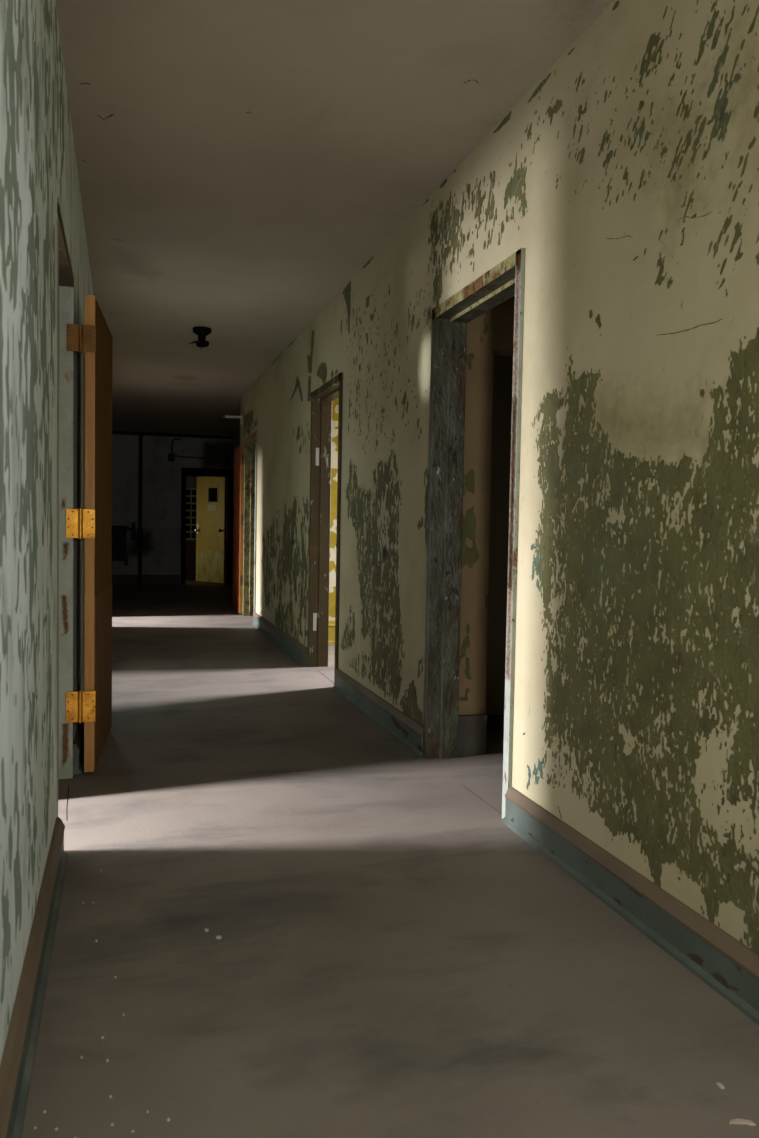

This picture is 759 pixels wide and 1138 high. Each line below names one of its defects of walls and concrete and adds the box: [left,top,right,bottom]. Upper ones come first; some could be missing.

peeling [261,494,309,646]
peeling [284,0,759,753]
peeling [526,327,759,954]